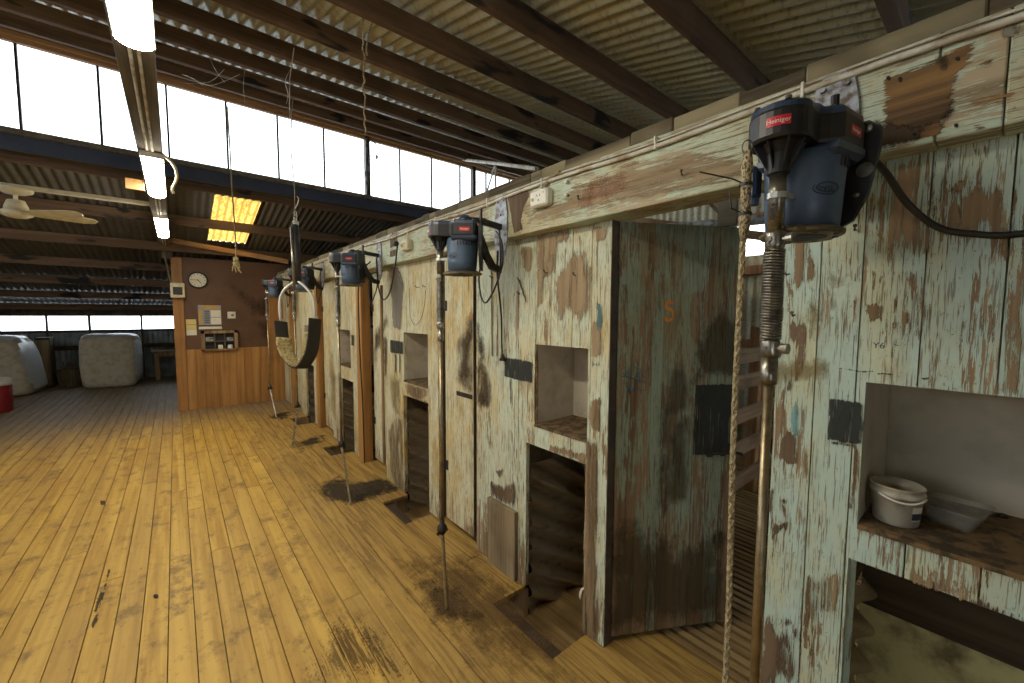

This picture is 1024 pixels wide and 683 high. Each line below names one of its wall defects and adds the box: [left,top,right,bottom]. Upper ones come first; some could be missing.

peeling [881,43,993,138]
peeling [508,143,741,356]
peeling [779,243,819,391]
peeling [858,146,1024,397]
peeling [388,417,404,490]
peeling [769,431,798,512]
peeling [832,442,857,509]
peeling [772,522,788,540]
peeling [761,570,846,683]
peeling [912,569,1024,621]